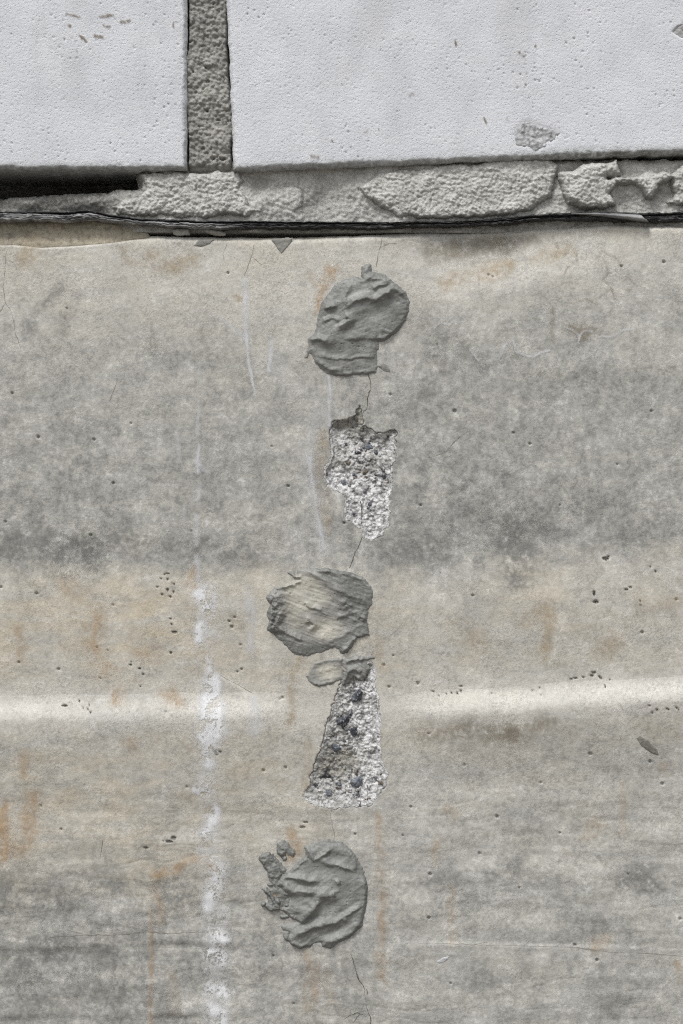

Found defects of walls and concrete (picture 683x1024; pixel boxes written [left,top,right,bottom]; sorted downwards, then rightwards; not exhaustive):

spalling [515,122,560,151]
spalling [0,221,150,248]
spalling [324,406,397,541]
efflorescence [192,587,216,645]
efflorescence [198,658,224,768]
spalling [303,661,389,810]
efflorescence [202,806,221,836]
efflorescence [202,866,224,911]
efflorescence [206,928,229,966]
efflorescence [205,982,230,1024]